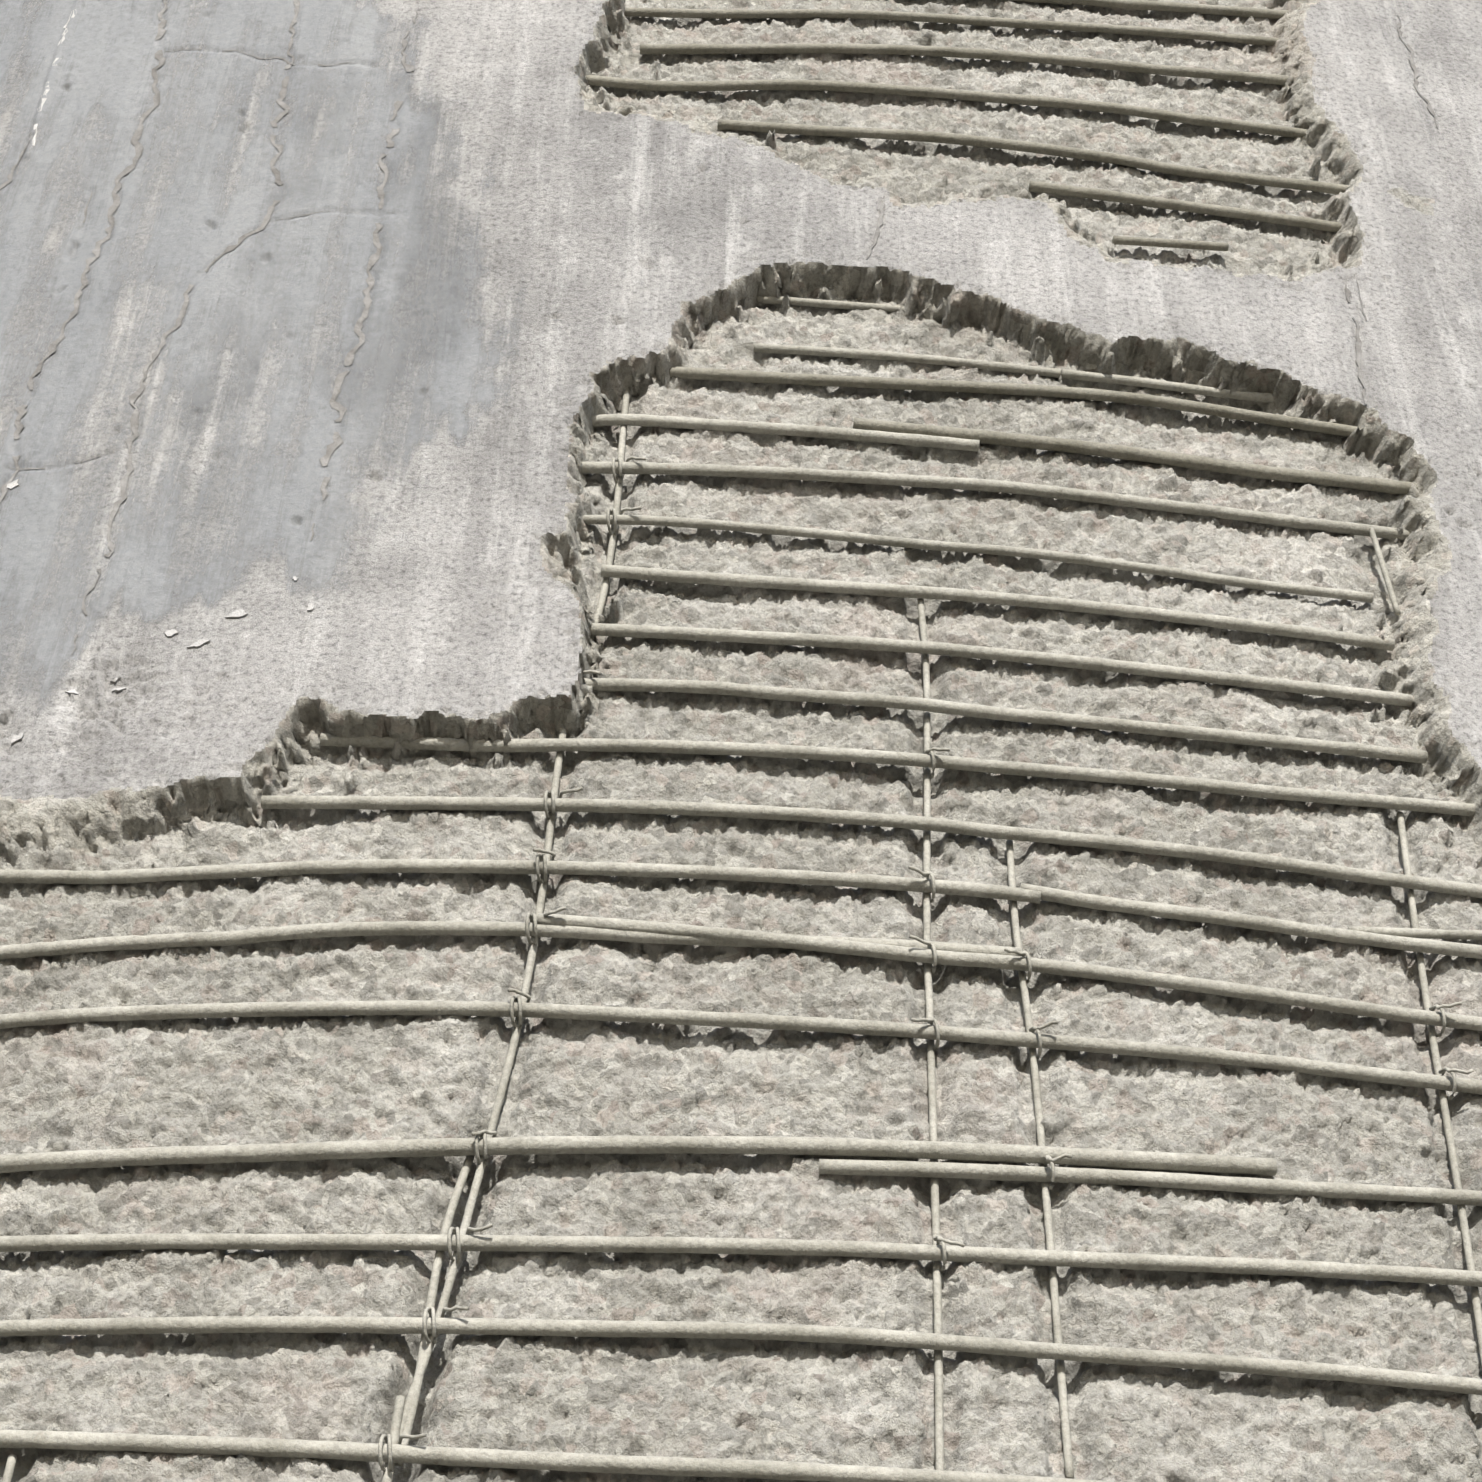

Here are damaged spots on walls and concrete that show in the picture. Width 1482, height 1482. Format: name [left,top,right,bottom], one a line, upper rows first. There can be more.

crack [0,0,356,655]
crack [310,12,418,541]
spalling [573,0,1365,282]
spalling [0,262,1482,1379]
spalling [0,1333,1482,1482]